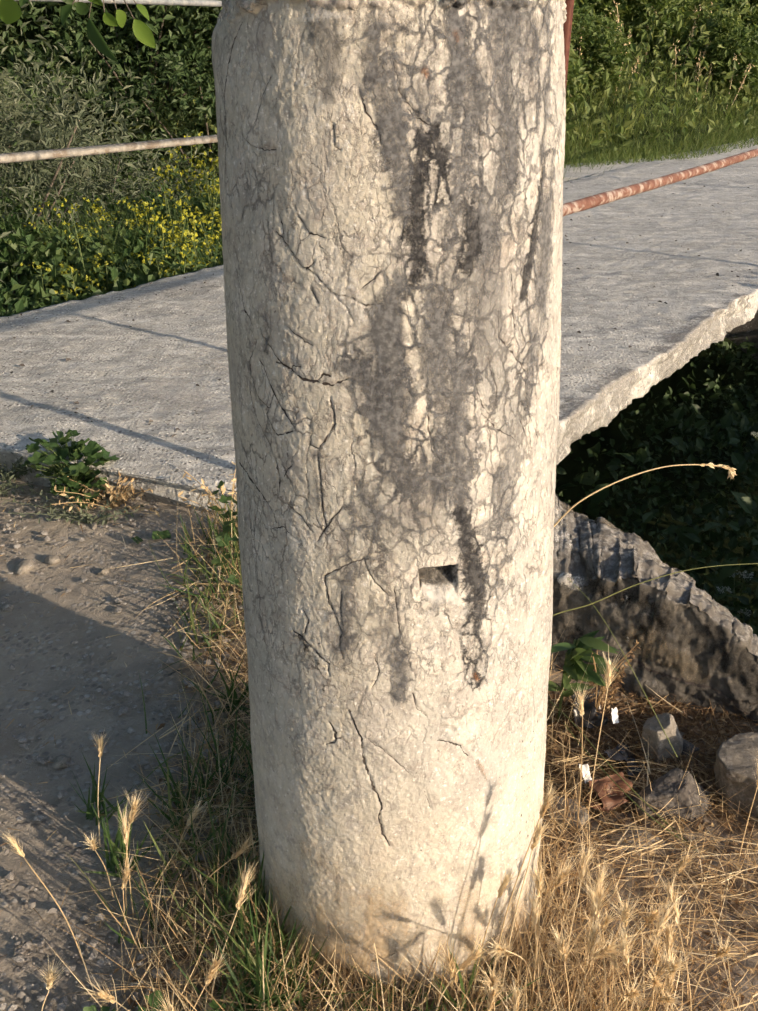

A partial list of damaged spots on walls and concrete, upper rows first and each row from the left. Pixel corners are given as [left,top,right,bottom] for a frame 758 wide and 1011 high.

water stain [304,10,350,22]
crack [359,87,381,142]
crack [276,214,381,316]
water stain [321,0,593,690]
crack [475,274,538,449]
crack [236,269,348,577]
water stain [314,447,326,506]
crack [426,402,437,458]
water stain [296,633,336,691]
crack [293,558,404,674]
water stain [389,631,413,705]
crack [326,711,409,846]